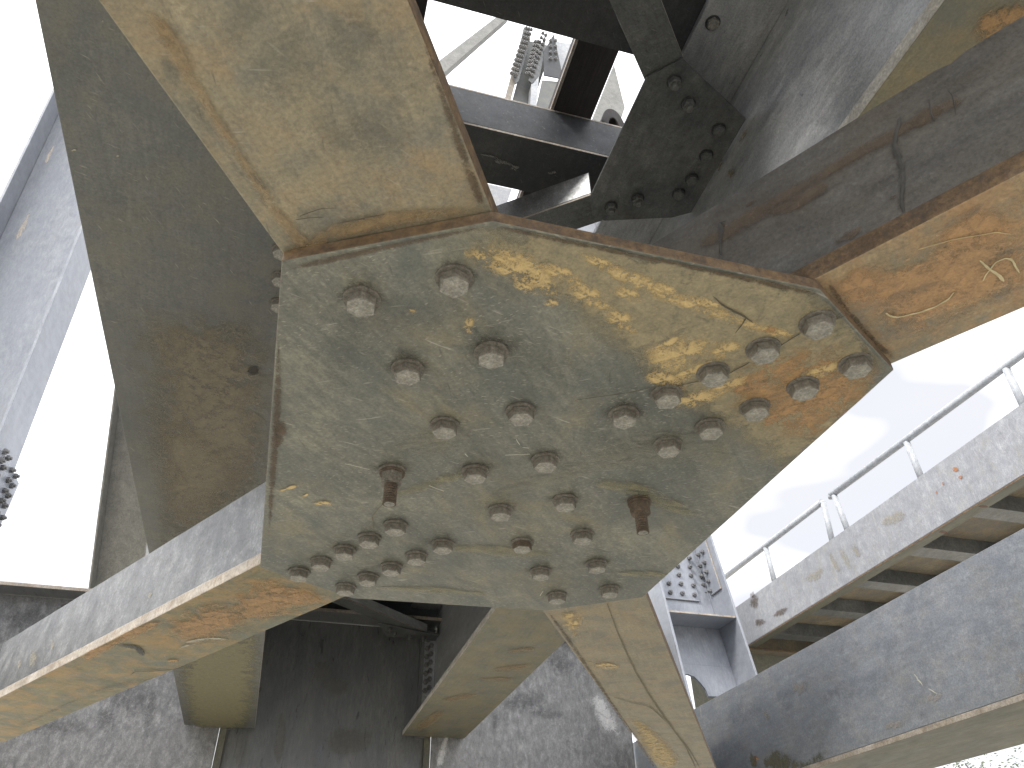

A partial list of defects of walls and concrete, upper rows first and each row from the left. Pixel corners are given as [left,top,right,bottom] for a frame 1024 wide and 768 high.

crack [892,117,905,212]
rust [300,229,473,267]
peeling [466,247,637,333]
peeling [583,254,792,340]
peeling [646,336,748,408]
crack [713,296,753,332]
rust [477,209,1024,468]
peeling [807,363,838,378]
rust [84,622,159,659]
rust [171,583,319,638]
rust [168,636,259,728]